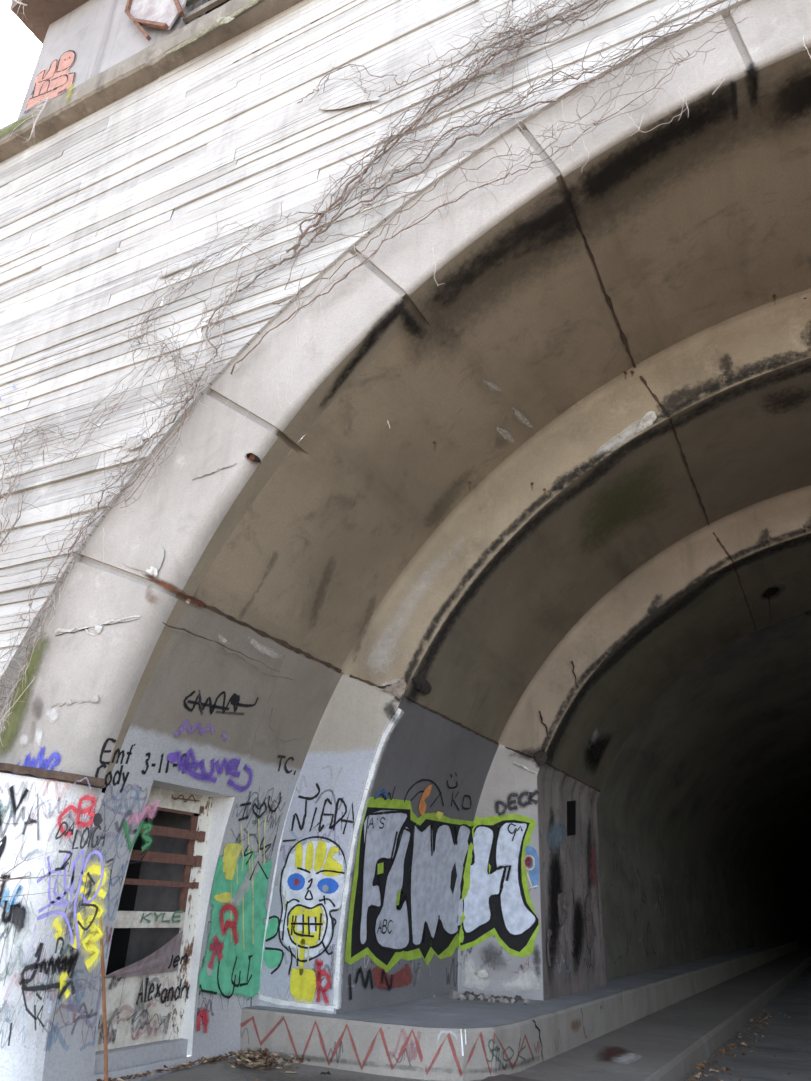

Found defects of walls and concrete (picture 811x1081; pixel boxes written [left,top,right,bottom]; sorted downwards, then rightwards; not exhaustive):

damp [435,63,758,304]
damp [321,300,423,405]
rust [145,574,205,607]
damp [395,325,811,702]